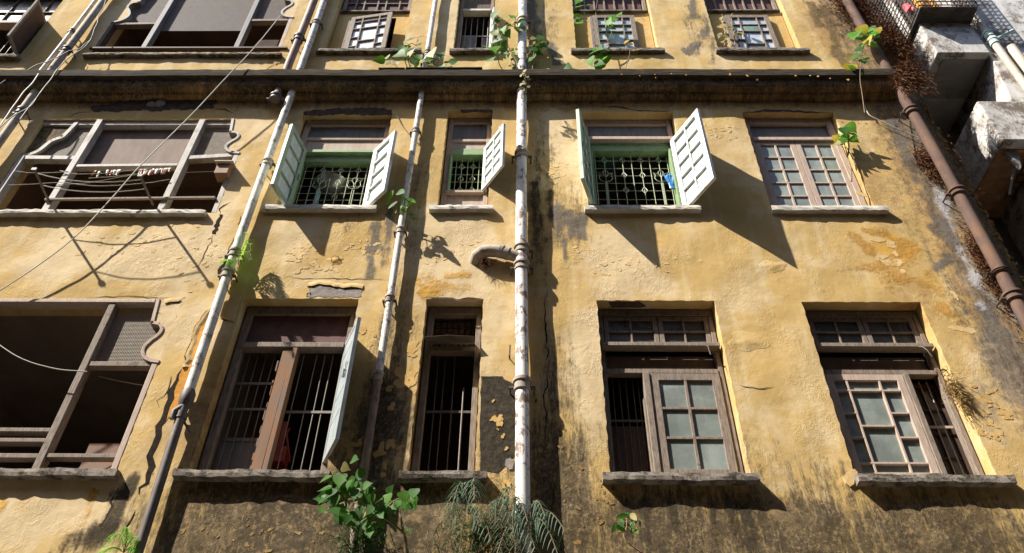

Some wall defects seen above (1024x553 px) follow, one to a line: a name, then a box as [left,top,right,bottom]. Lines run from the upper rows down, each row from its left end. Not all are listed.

damp [681,0,715,59]
crack [198,202,241,266]
damp [527,181,587,264]
peeling [869,236,906,274]
flaking render [306,285,363,298]
peeling [949,326,977,334]
crack [542,298,550,436]
peeling [489,399,513,460]
peeling [968,383,1013,441]
damp [620,496,651,553]
damp [709,495,758,550]